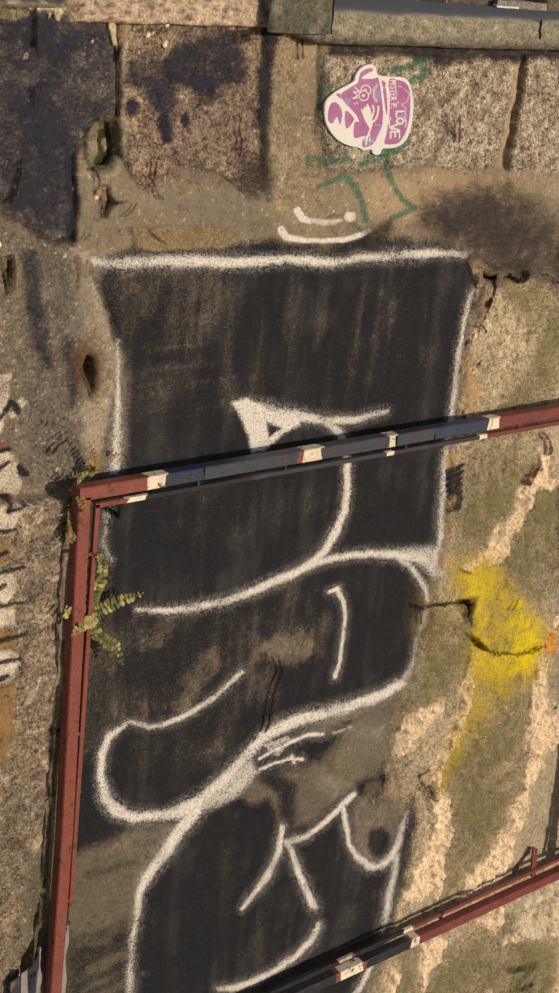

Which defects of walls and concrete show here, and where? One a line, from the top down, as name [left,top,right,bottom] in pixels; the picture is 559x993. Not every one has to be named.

spalling [86,116,121,218]
crack [460,271,559,375]
spalling [79,350,102,399]
crack [414,599,546,657]
crack [265,658,283,733]